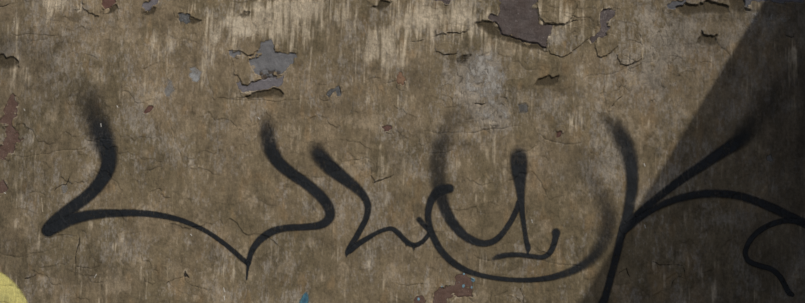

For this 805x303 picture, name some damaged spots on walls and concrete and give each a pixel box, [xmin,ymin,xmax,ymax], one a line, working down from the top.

peeling [102,0,117,14]
spalling [662,0,805,14]
peeling [232,11,259,37]
peeling [477,0,552,52]
spalling [0,54,19,66]
peeling [229,39,297,99]
peeling [0,94,24,161]
peeling [409,273,477,303]